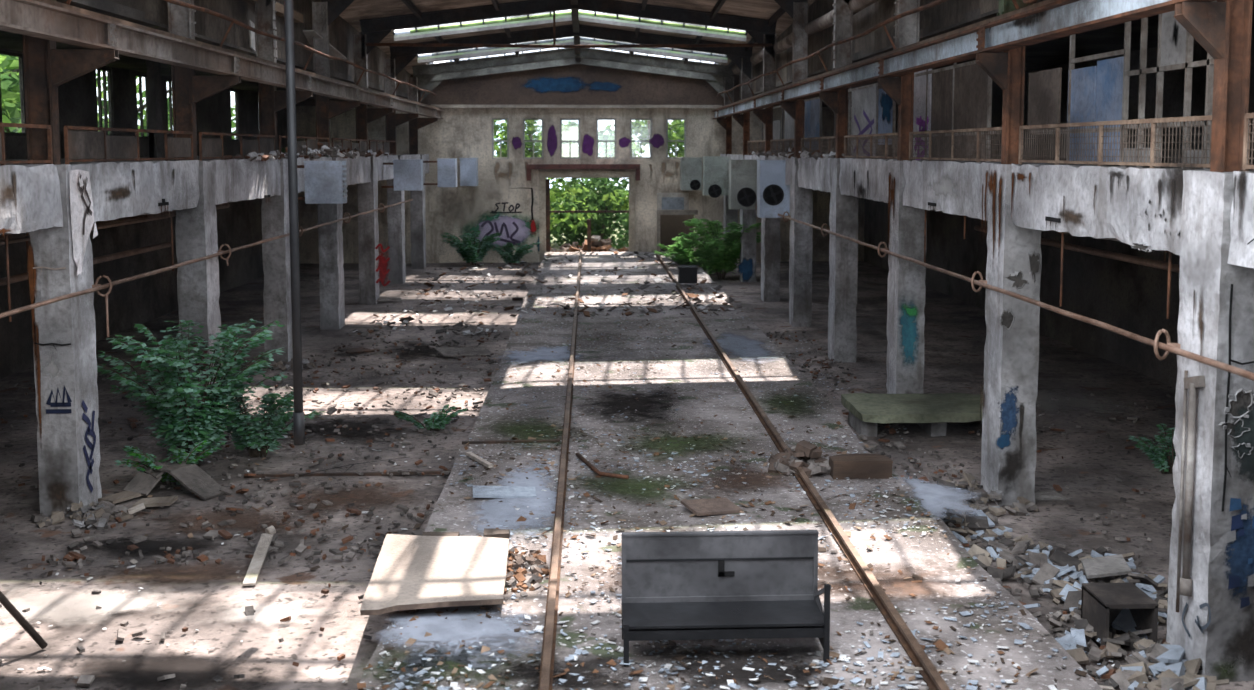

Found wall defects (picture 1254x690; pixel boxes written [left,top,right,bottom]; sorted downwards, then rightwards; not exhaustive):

water stain [1046,171,1129,228]
water stain [1145,155,1195,236]